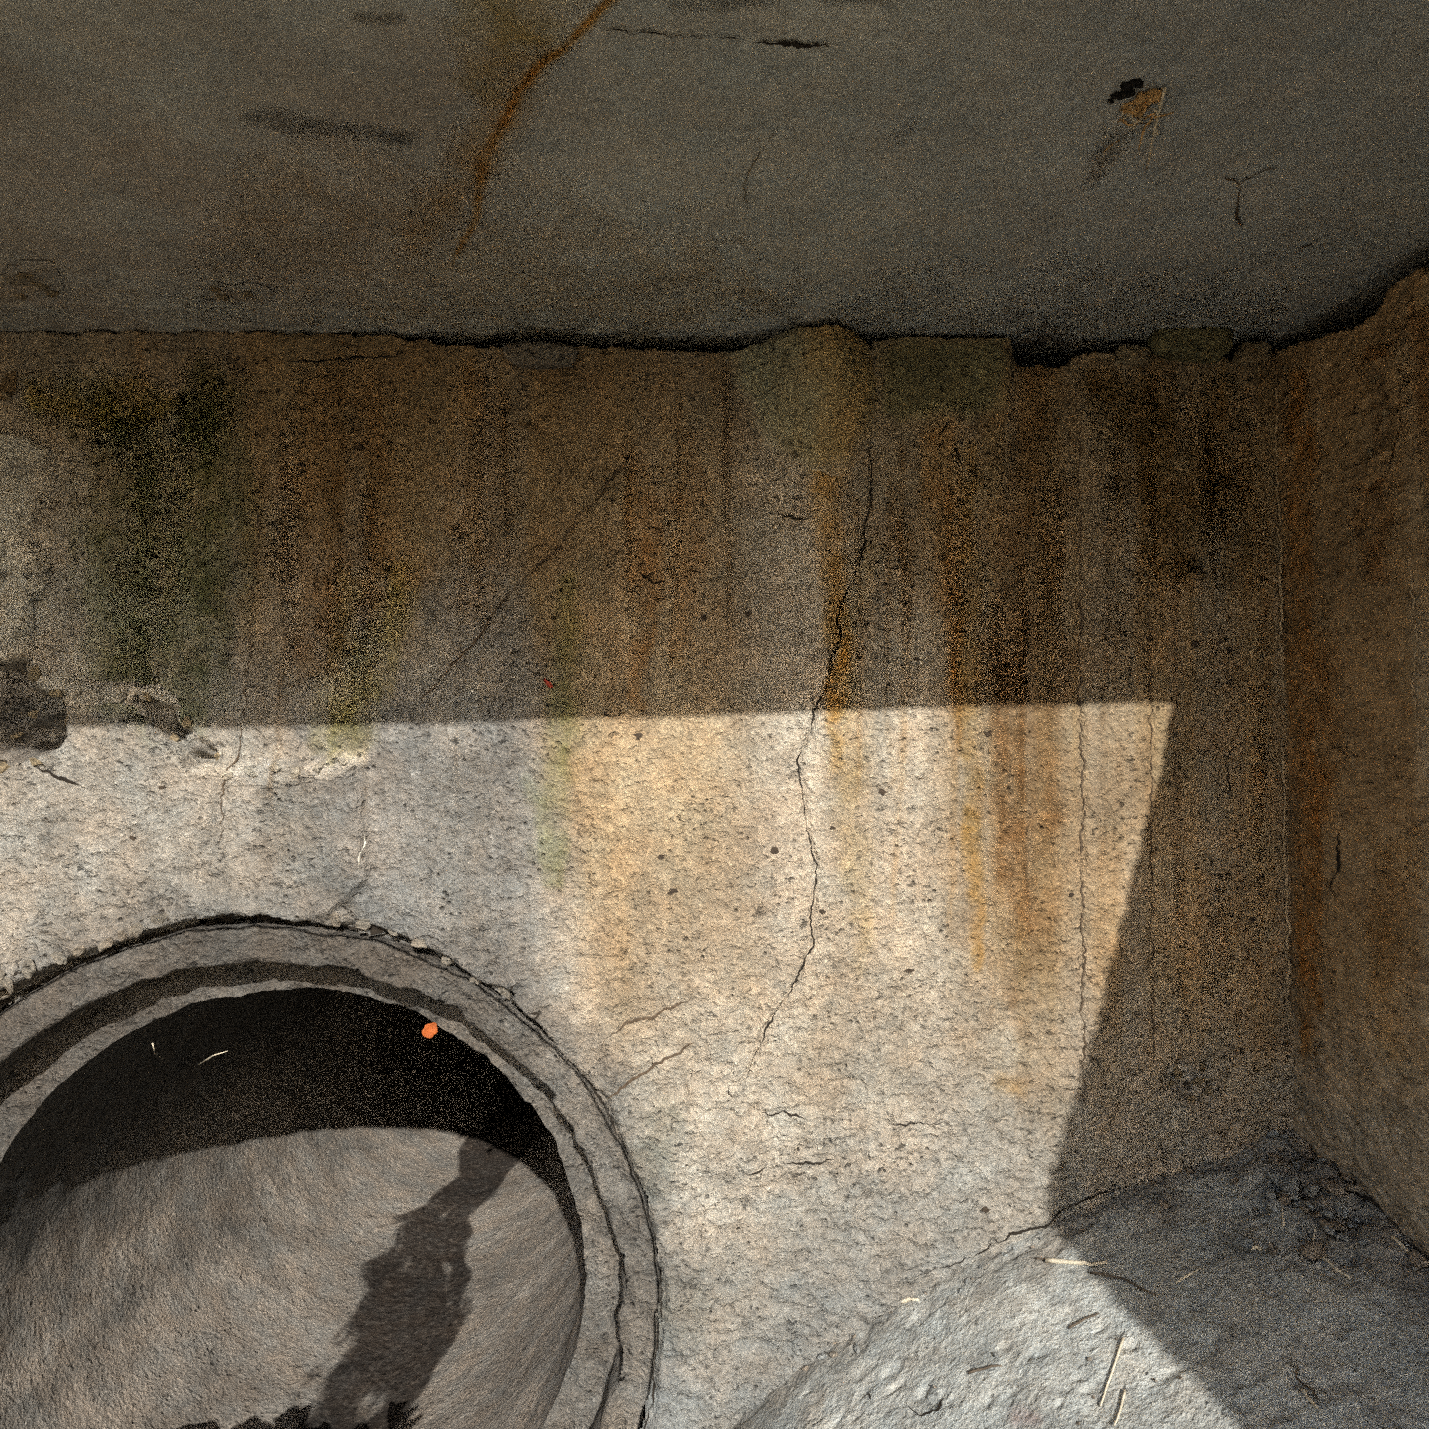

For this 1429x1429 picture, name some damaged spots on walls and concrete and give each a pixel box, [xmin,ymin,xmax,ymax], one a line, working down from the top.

peeling [0,432,358,788]
crack [407,444,635,715]
water stain [1274,374,1284,661]
crack [728,419,951,1118]
water stain [1281,739,1292,1021]